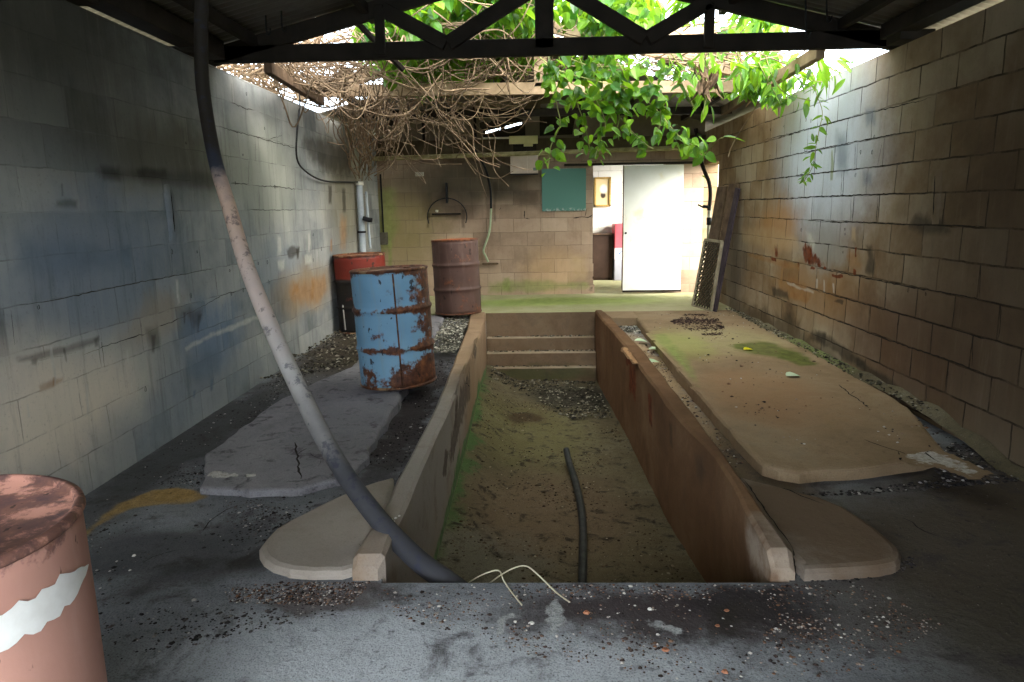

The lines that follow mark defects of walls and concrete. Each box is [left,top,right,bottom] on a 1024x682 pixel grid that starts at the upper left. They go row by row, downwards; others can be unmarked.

corrosion [283,207,350,316]
corrosion [746,240,844,309]
crack [294,443,321,478]
spalling [894,449,993,479]